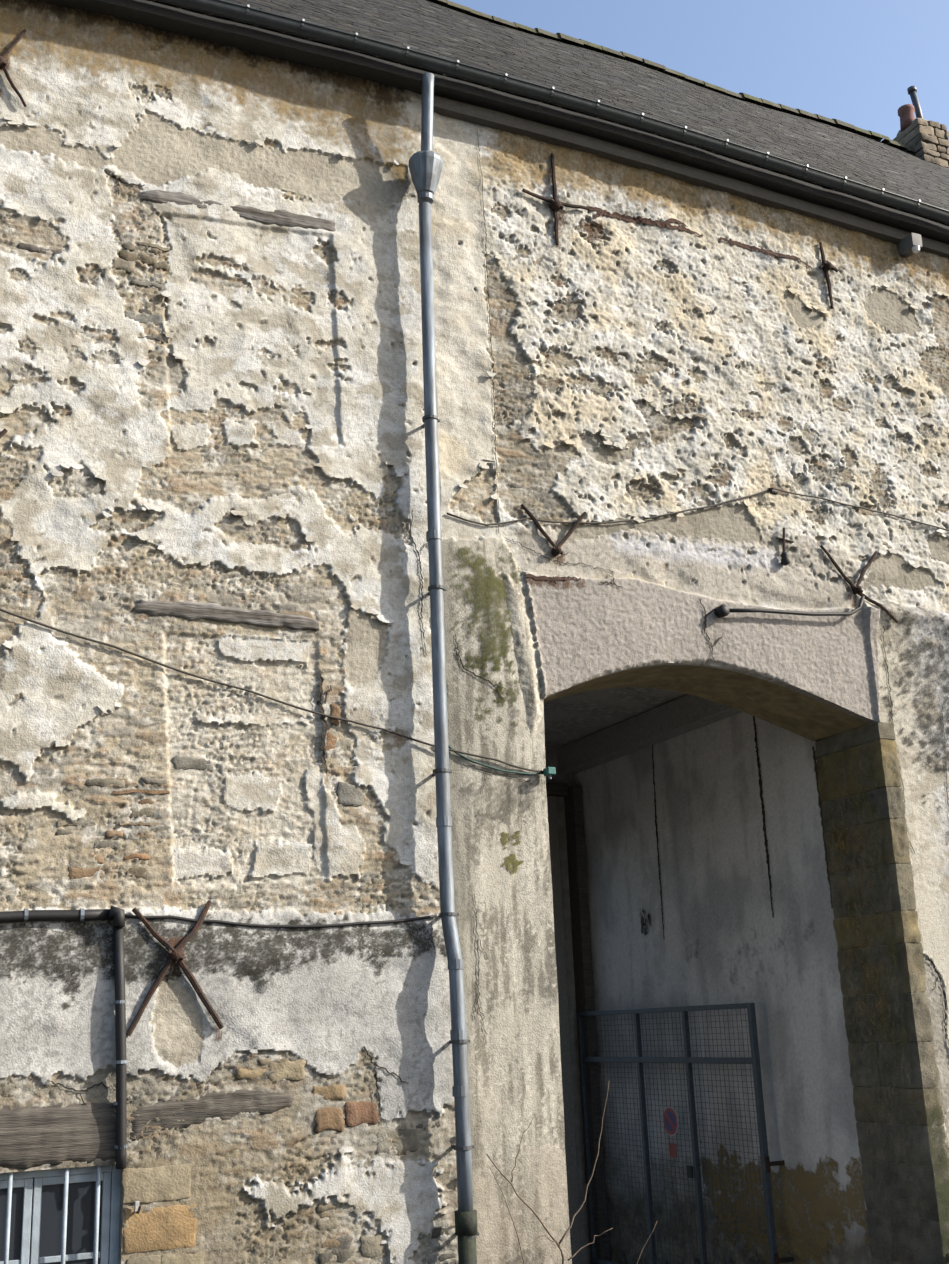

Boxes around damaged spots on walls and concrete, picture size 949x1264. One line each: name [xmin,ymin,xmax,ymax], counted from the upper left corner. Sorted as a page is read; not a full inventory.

flaking render [0,84,440,917]